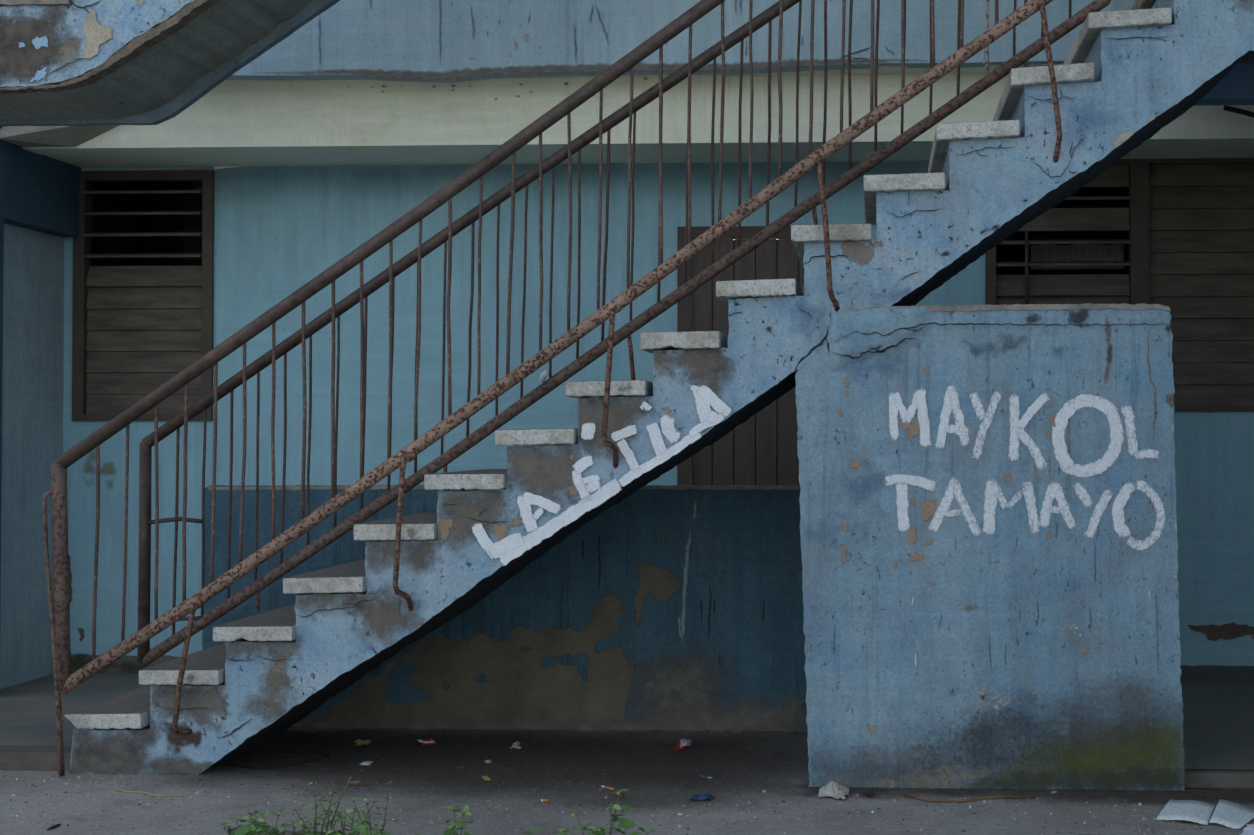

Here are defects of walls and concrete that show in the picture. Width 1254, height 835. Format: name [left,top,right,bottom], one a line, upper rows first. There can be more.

peeling [30,67,46,82]
peeling [18,10,112,68]
crack [794,243,1168,368]
peeling [323,561,681,732]
peeling [1188,622,1254,641]
leakage [815,691,1181,790]